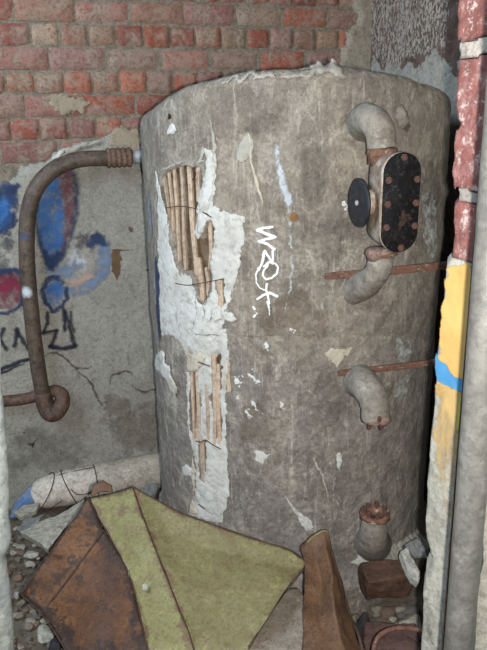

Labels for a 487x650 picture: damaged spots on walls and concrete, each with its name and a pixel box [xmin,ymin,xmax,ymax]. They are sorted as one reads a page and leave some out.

peeling [370,0,461,77]
peeling [48,93,90,115]
peeling [52,124,141,160]
peeling [236,133,263,205]
peeling [155,113,245,523]
peeling [325,346,352,367]
crack [48,352,104,406]
crack [110,370,156,393]
peeling [253,450,271,464]